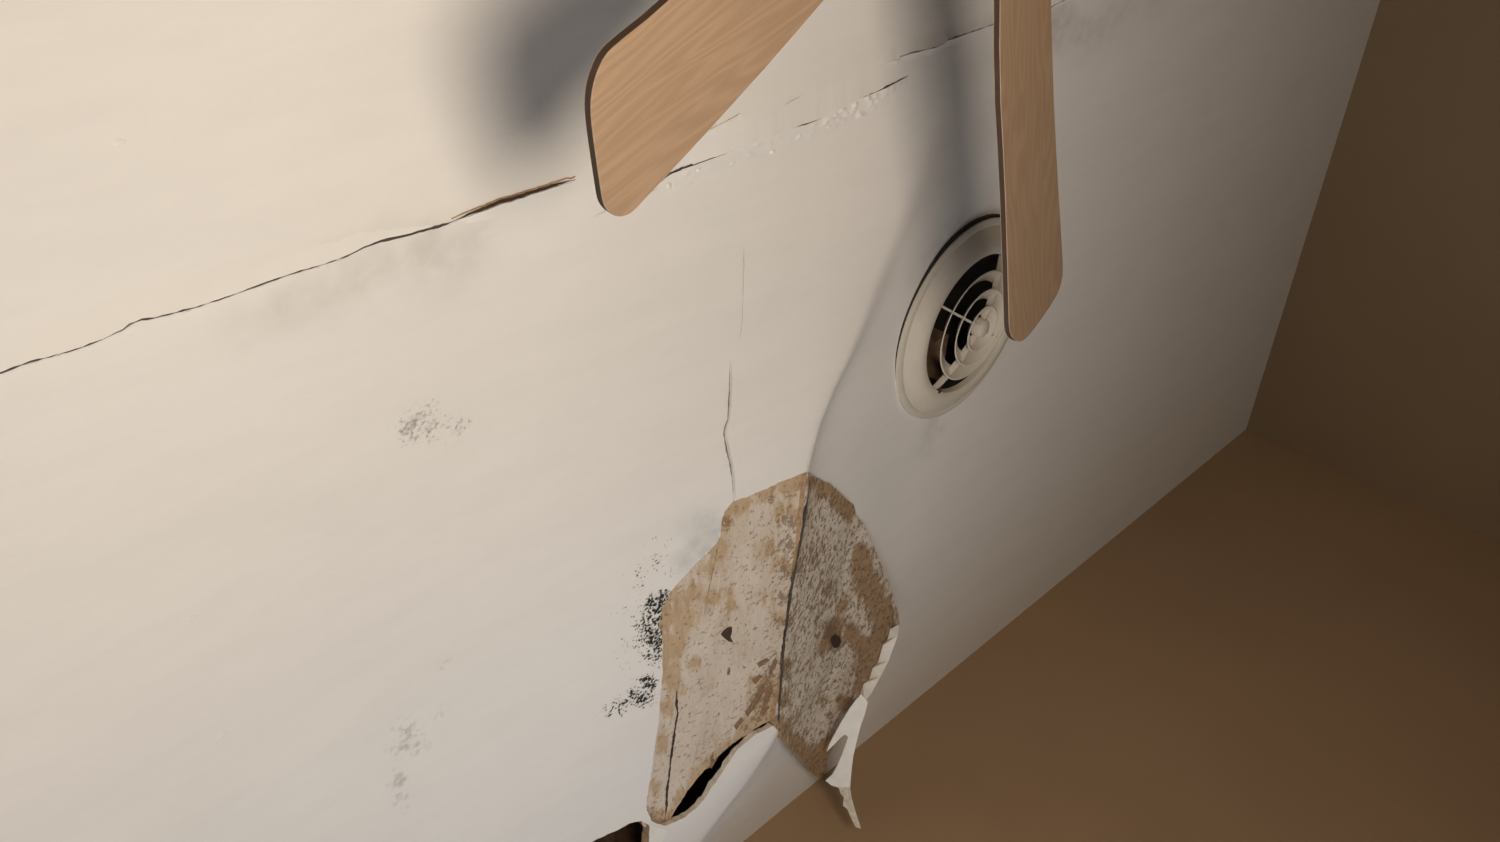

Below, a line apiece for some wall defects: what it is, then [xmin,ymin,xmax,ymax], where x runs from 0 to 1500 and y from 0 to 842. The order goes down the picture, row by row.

crack [1051,0,1084,12]
crack [648,10,993,196]
crack [0,176,607,377]
crack [723,270,744,501]
spalling [927,327,949,381]
water stain [603,539,672,717]
spalling [593,472,900,842]